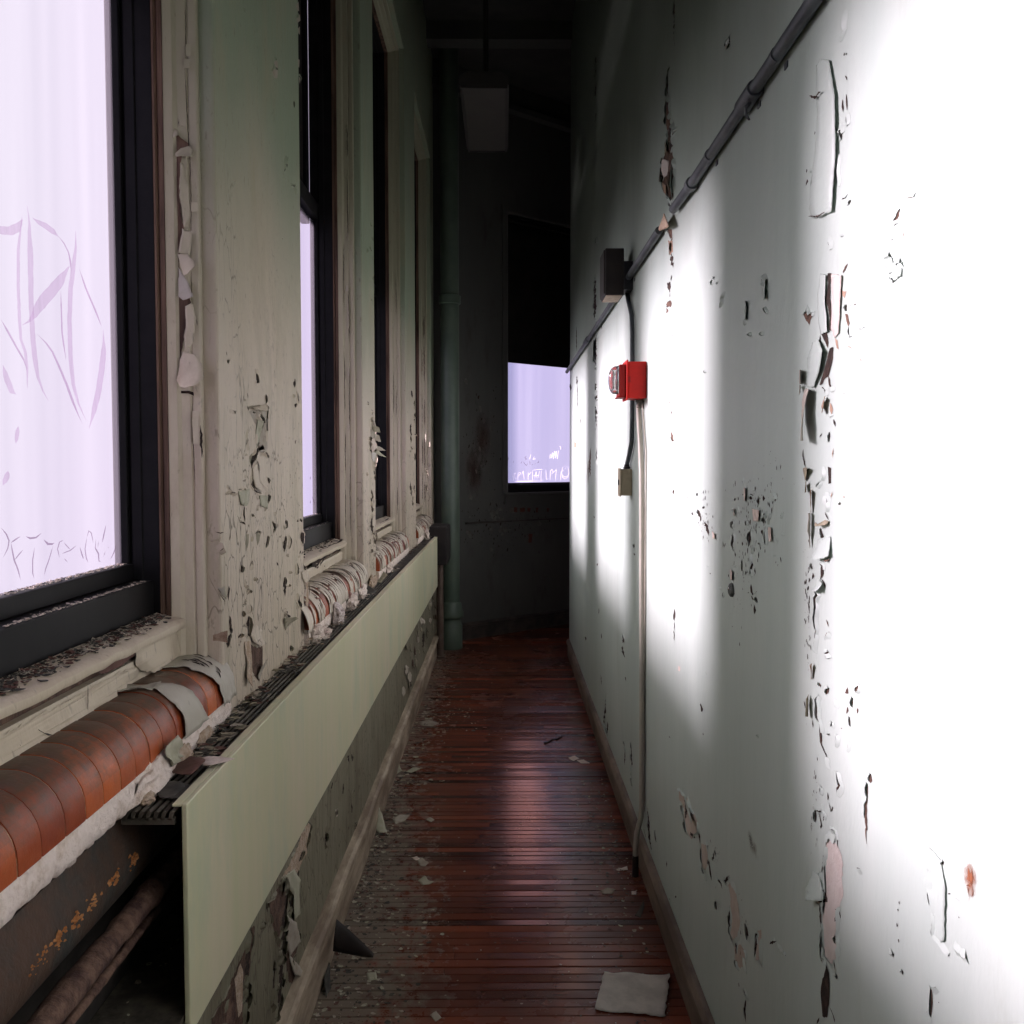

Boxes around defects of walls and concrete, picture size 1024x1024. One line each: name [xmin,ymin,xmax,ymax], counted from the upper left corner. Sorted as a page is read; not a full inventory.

peeling [806,59,851,219]
peeling [173,13,204,472]
spalling [658,214,669,231]
peeling [229,369,271,512]
peeling [283,391,434,634]
peeling [689,478,785,614]
corrosion [29,852,139,977]
peeling [260,821,312,1024]
peeling [677,788,763,974]
peeling [820,826,843,978]
corrosion [965,865,975,895]